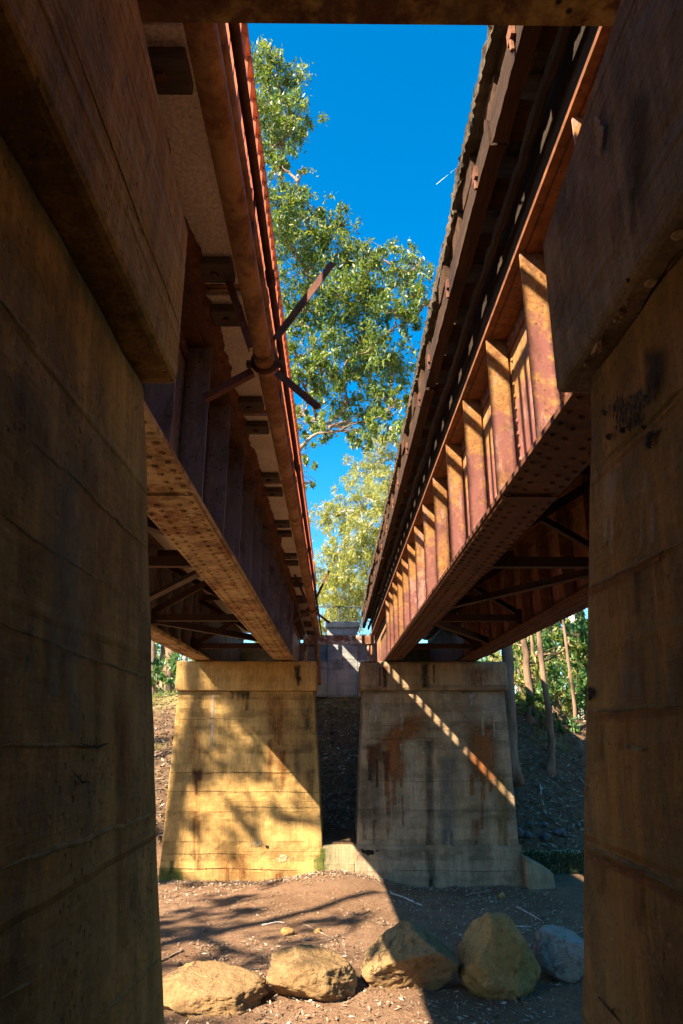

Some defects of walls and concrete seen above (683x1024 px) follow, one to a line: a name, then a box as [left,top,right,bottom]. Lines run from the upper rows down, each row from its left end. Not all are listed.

rust [367,717,420,825]
rust [469,725,508,845]